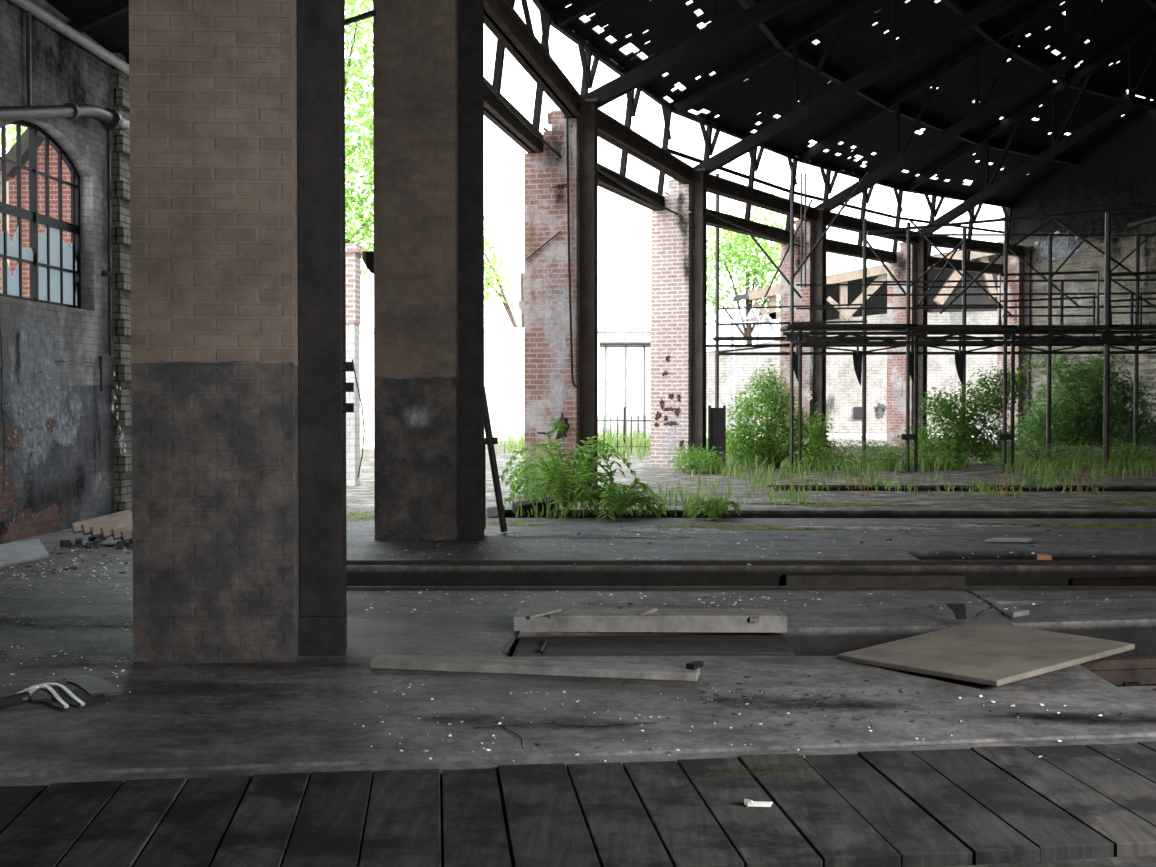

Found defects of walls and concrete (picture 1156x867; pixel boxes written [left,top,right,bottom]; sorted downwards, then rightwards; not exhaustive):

peeling [0,320,82,543]
spalling [555,412,570,440]
hole [654,393,681,427]